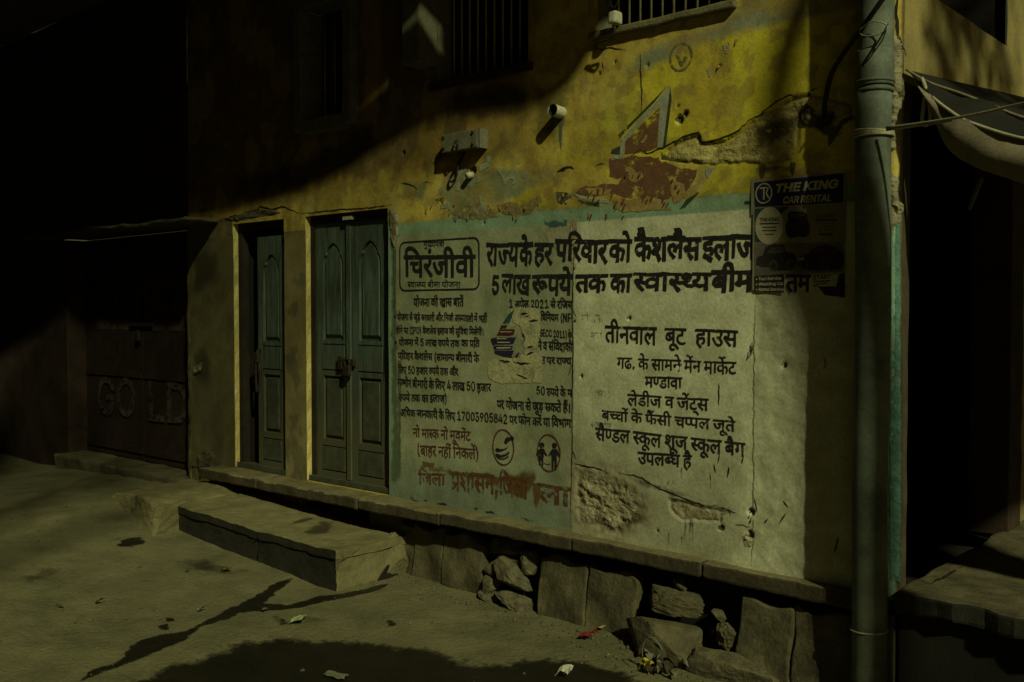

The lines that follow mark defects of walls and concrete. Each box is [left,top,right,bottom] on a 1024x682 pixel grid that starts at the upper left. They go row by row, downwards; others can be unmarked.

flaking render [667,96,855,164]
peeling [425,195,542,221]
peeling [605,179,686,219]
crack [568,238,758,557]
flaking render [578,472,640,531]